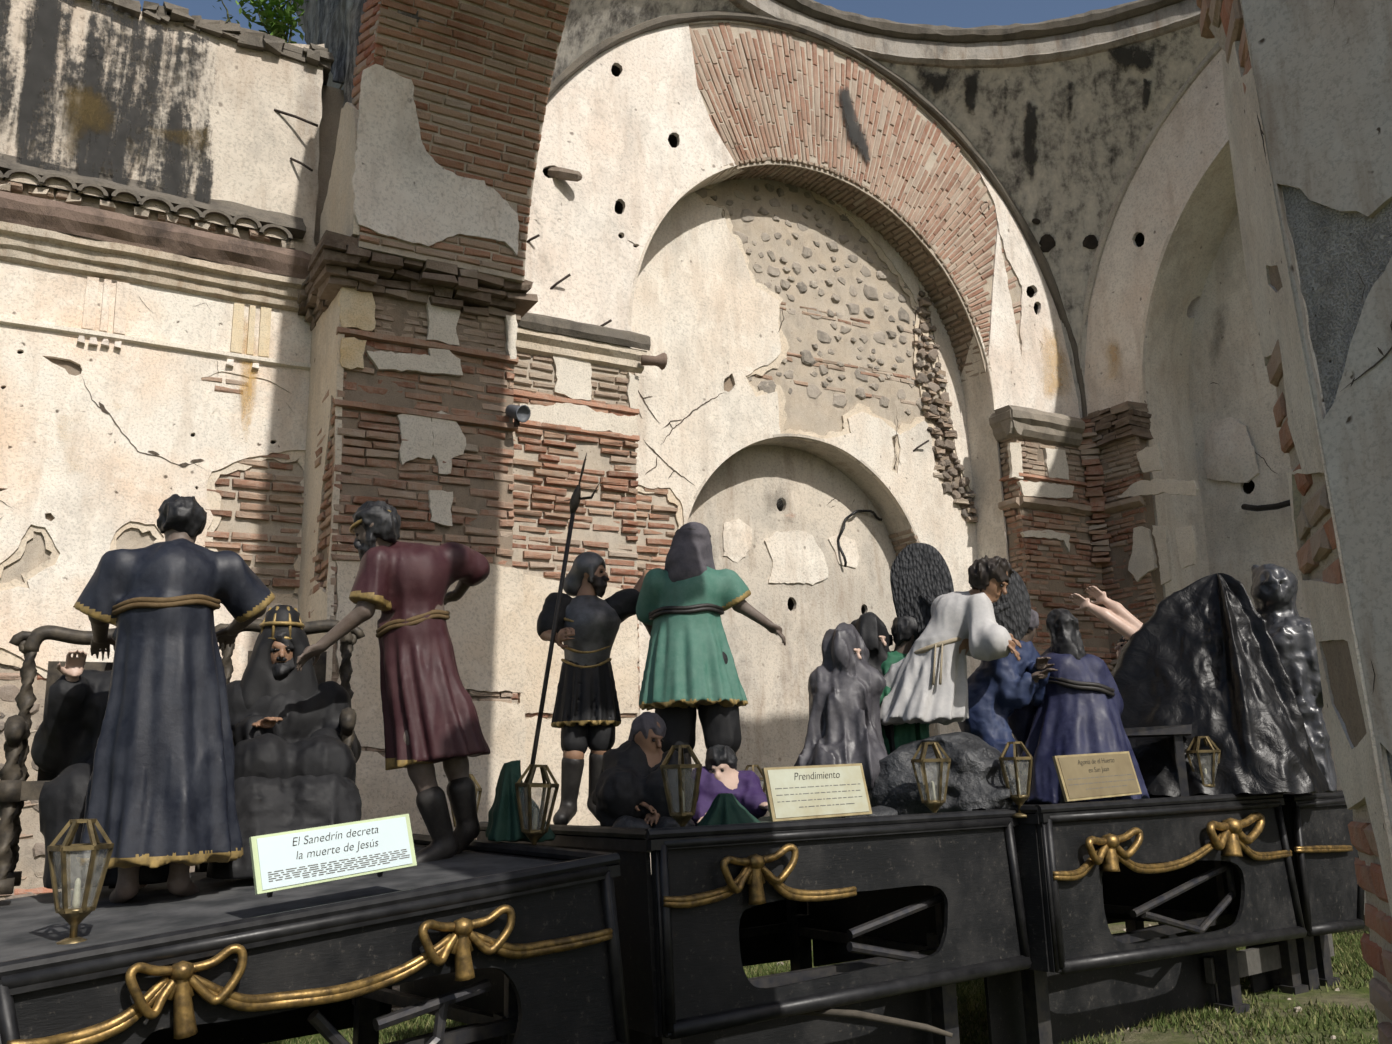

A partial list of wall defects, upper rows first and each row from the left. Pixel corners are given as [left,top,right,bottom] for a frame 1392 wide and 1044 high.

water stain [0,0,216,204]
peeling [352,64,519,256]
water stain [919,64,978,113]
water stain [1023,102,1038,178]
water stain [1108,44,1154,112]
flaking render [695,177,978,523]
crack [1340,321,1392,392]
crack [83,379,204,469]
crack [638,390,724,485]
flaking render [195,441,305,605]
flaking render [0,648,47,781]
flaking render [0,800,74,900]